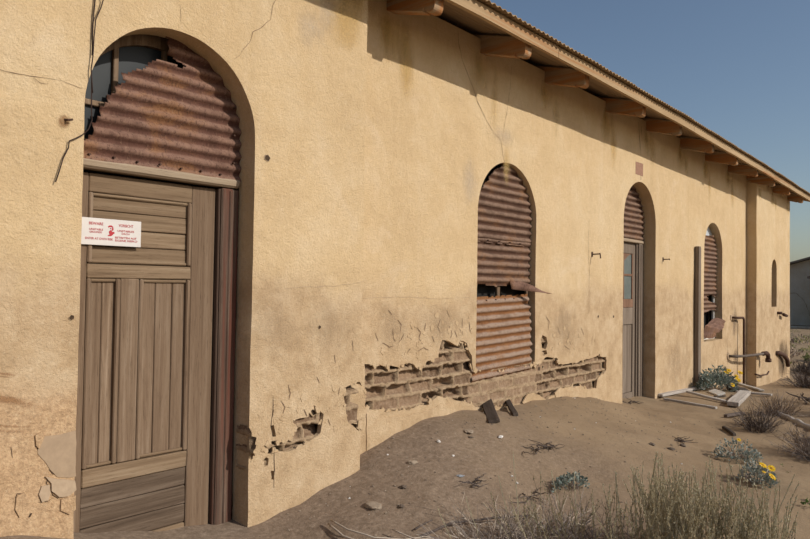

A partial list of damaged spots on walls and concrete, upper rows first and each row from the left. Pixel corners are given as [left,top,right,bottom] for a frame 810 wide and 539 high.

spalling [343,336,607,451]
peeling [35,431,76,514]
spalling [235,405,322,470]